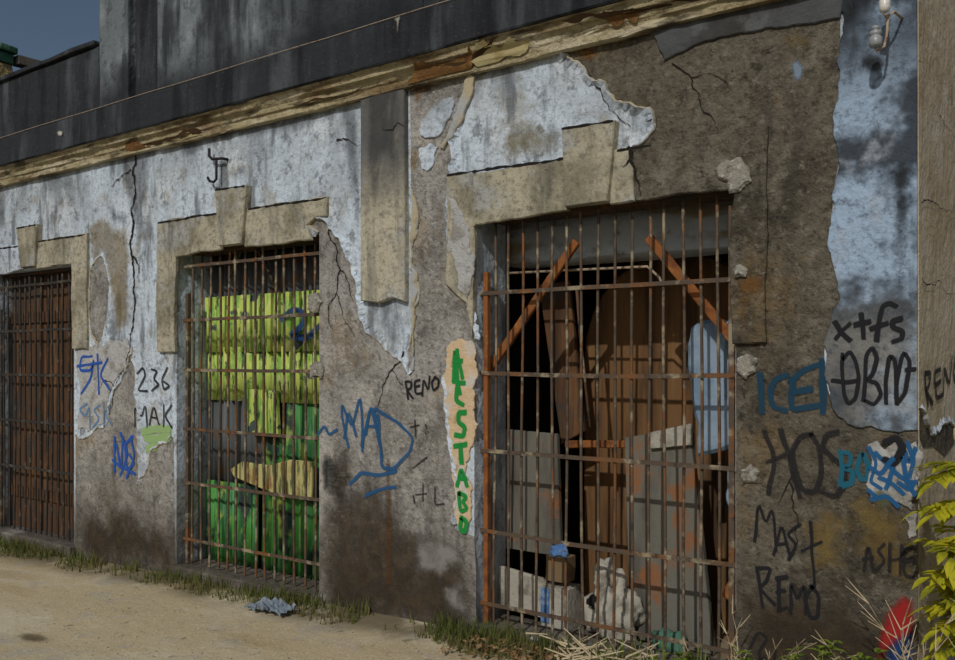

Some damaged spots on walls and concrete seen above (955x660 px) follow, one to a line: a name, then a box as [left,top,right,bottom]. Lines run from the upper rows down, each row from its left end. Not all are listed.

peeling [591,10,639,27]
crack [672,63,728,133]
flaking render [74,253,175,572]
crack [101,128,206,413]
crack [328,230,354,334]
flaking render [307,36,531,629]
rust [565,440,625,448]
flaking render [552,19,955,660]
damp [323,458,457,624]